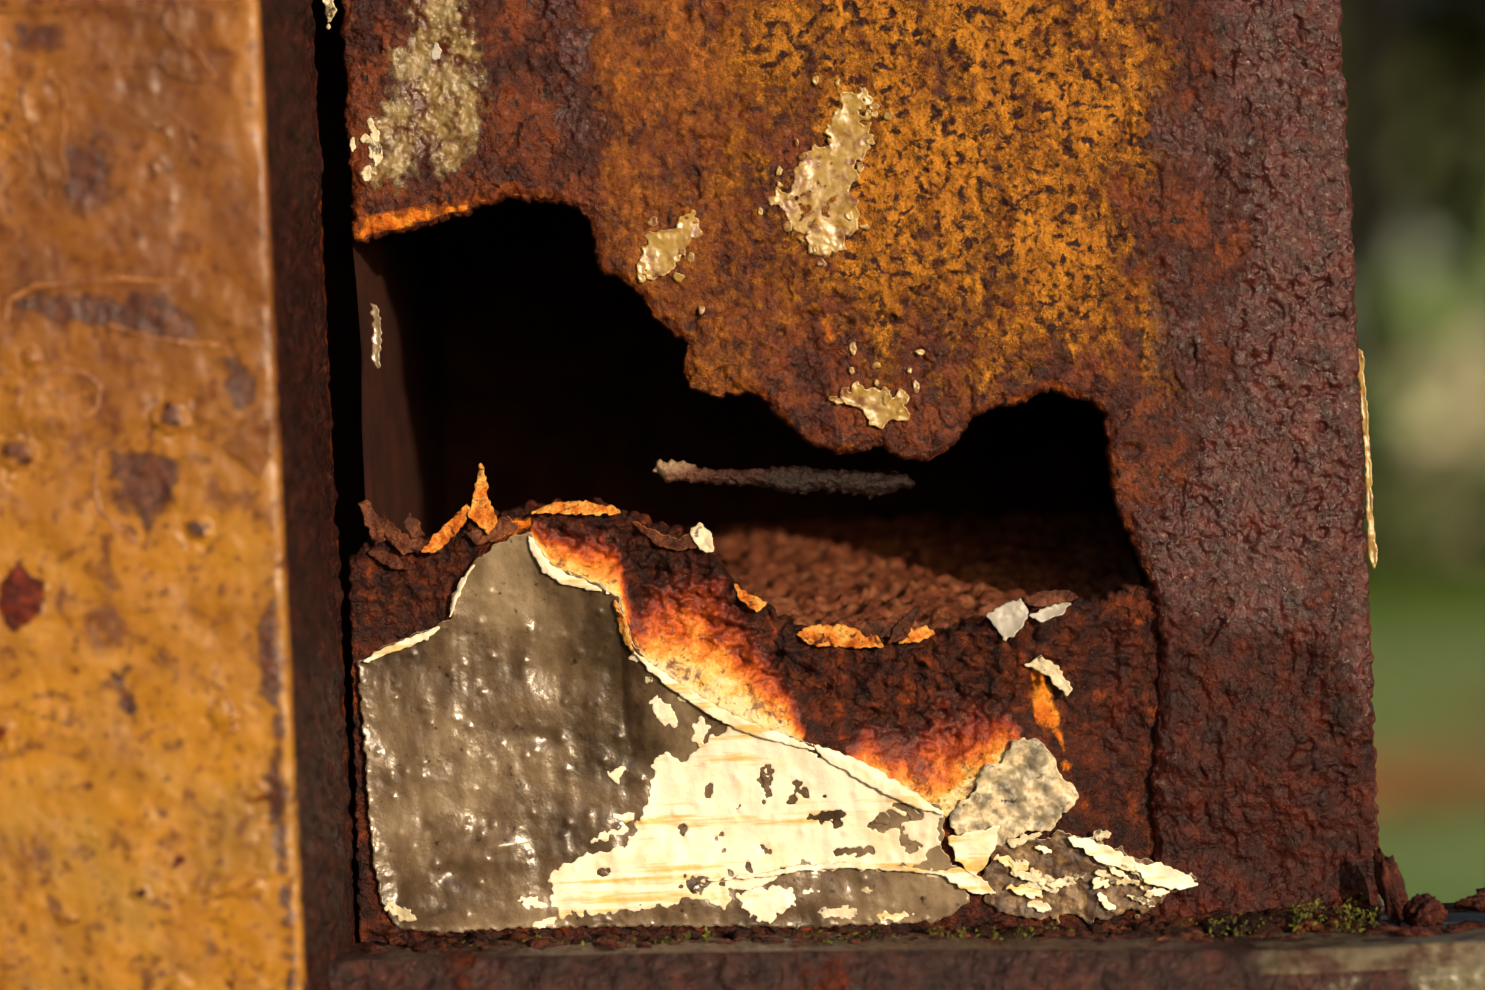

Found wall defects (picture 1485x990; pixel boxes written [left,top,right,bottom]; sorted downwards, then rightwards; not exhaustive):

peeling [322,0,337,29]
peeling [350,0,487,196]
peeling [758,76,893,267]
peeling [637,209,703,283]
peeling [370,303,382,369]
peeling [828,342,925,429]
rust [110,451,178,533]
rust [348,0,1474,944]
rust [0,563,45,632]
peeling [357,532,1198,933]